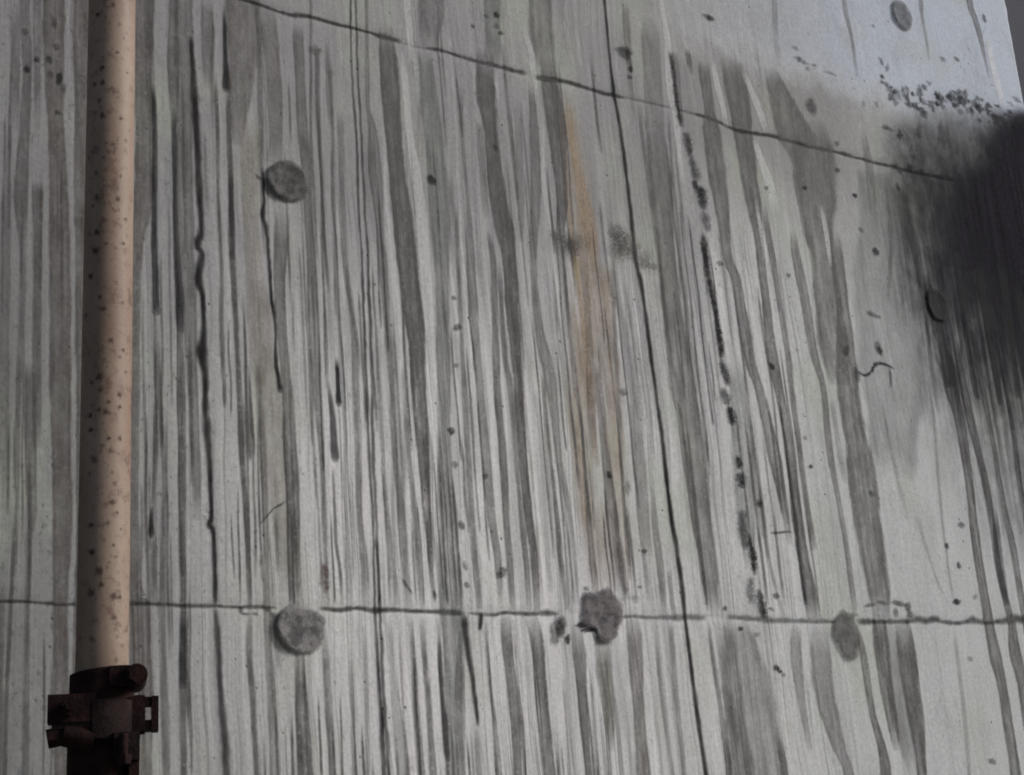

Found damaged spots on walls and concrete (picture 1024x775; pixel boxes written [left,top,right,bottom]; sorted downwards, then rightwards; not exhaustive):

crack [0,598,75,606]
crack [129,40,272,775]
crack [243,0,557,775]
crack [429,0,708,775]
crack [736,457,784,621]
crack [670,55,911,424]
crack [862,616,1024,625]
damp [899,112,1024,775]